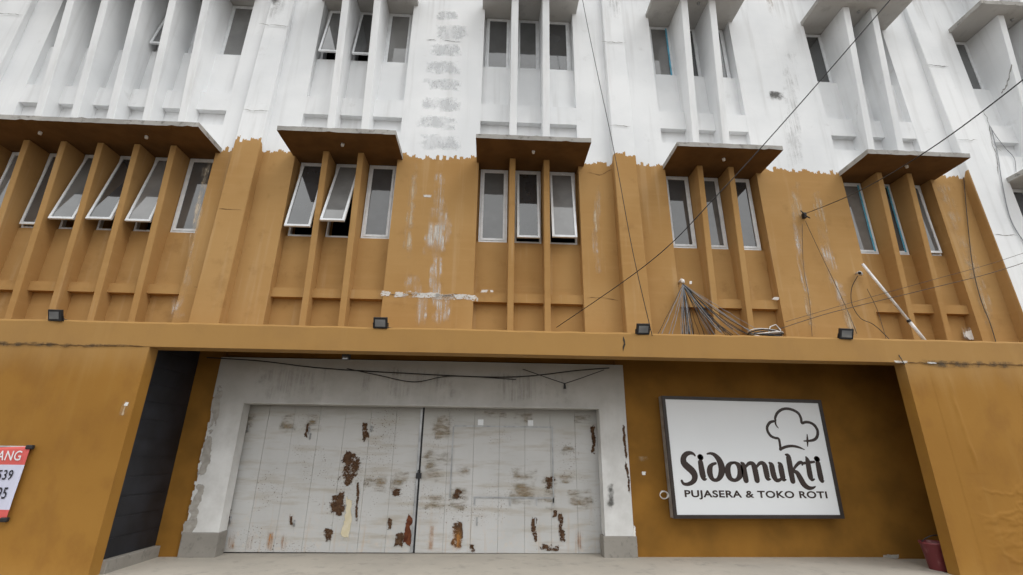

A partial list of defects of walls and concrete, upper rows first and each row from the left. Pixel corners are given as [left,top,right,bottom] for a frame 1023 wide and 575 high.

spalling [181,386,223,534]
corrosion [387,514,413,548]
corrosion [450,489,475,552]
corrosion [531,510,566,551]